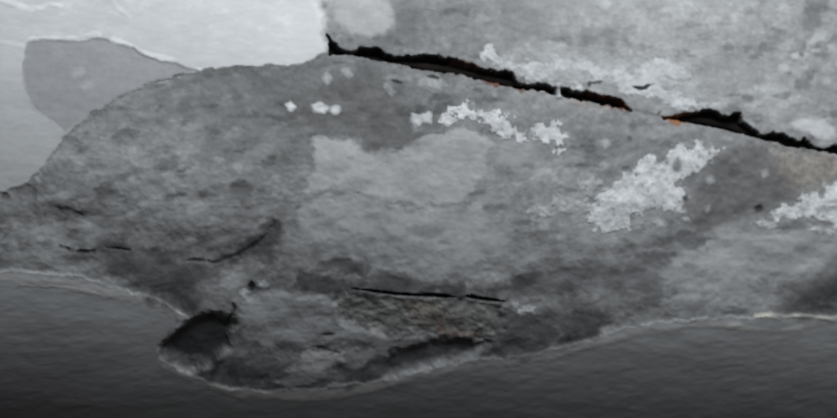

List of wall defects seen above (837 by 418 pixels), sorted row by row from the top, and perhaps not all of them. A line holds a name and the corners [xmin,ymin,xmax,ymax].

crack [326,33,655,112]
spalling [0,0,837,306]
crack [656,108,837,155]
spalling [154,184,343,357]
crack [352,288,505,303]
spalling [156,289,821,403]
leakage [290,133,801,393]